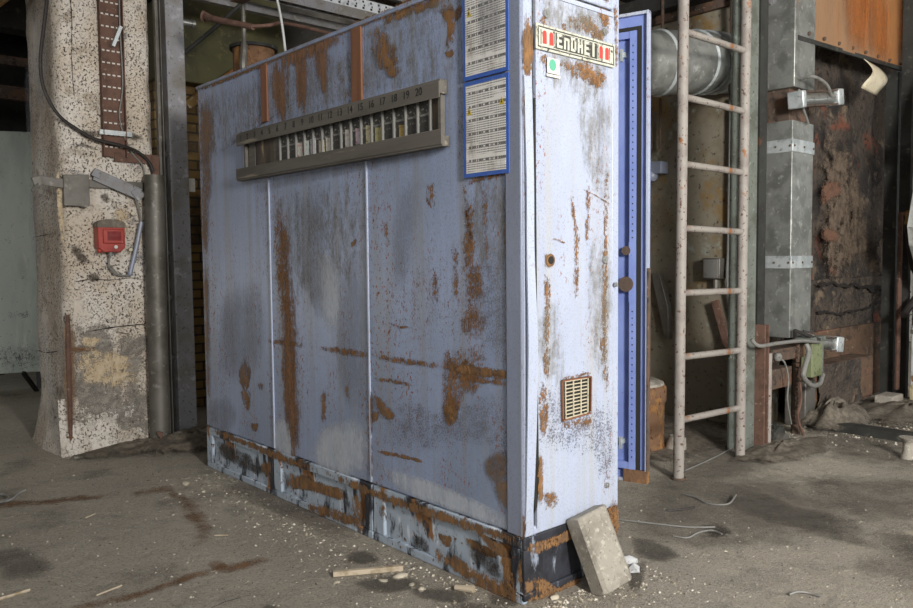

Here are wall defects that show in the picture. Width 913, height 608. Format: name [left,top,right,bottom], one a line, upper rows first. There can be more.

spalling [819,119,883,287]